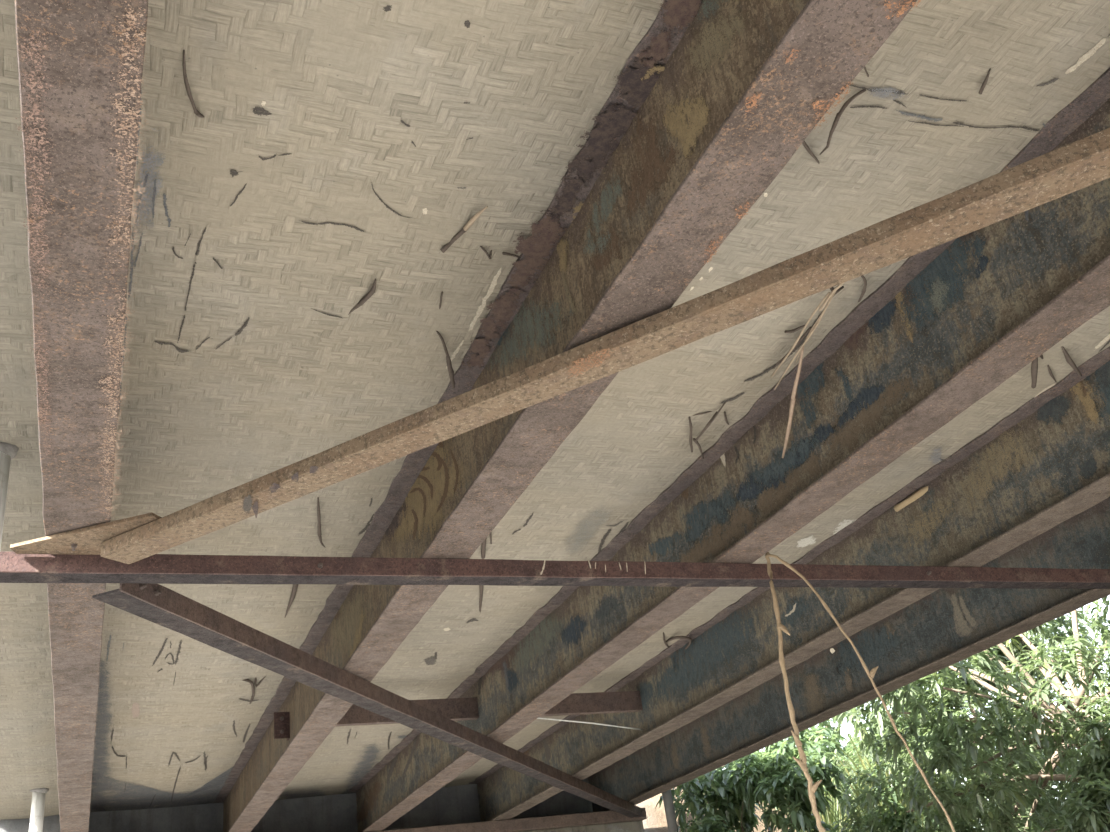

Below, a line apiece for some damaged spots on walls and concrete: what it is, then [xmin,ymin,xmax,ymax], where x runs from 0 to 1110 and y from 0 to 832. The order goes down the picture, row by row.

peeling [641,65,665,81]
peeling [662,92,712,165]
peeling [446,267,502,369]
damp [861,231,989,337]
damp [649,359,885,558]